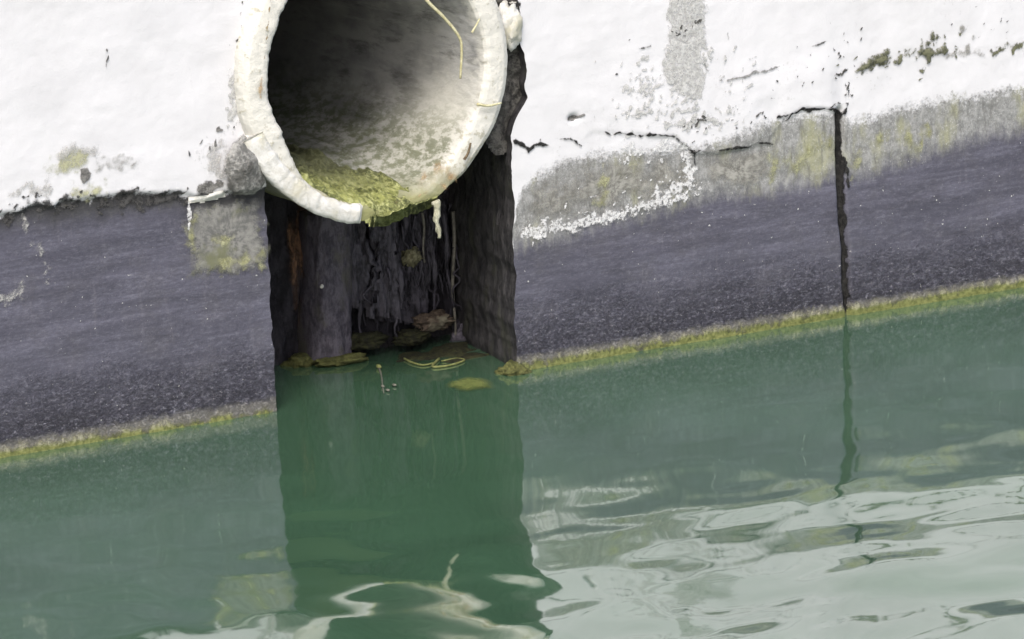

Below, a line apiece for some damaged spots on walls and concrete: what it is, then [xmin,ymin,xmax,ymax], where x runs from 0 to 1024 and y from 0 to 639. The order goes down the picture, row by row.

peeling [612,0,767,148]
spalling [197,180,224,196]
leakage [520,138,768,245]
crack [605,132,773,165]
crack [777,90,850,312]